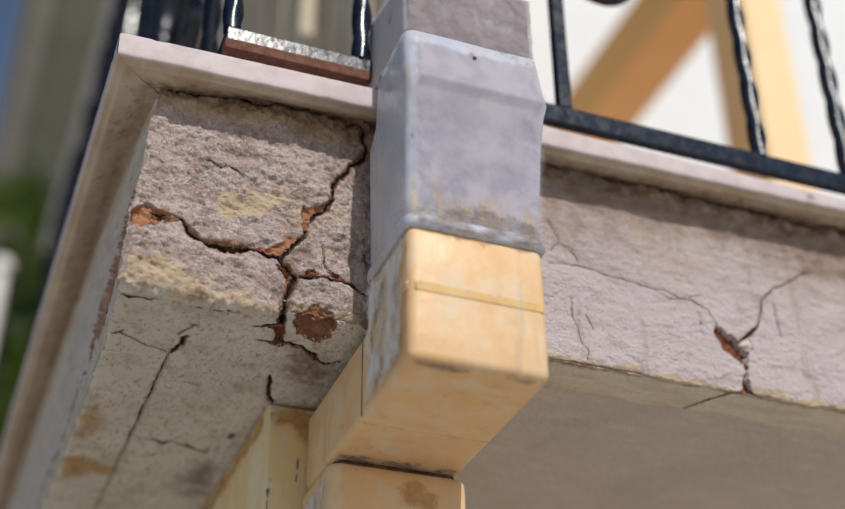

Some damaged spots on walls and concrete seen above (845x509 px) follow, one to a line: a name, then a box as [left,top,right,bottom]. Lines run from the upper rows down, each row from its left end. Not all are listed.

spalling [89,172,183,360]
crack [95,89,369,509]
spalling [292,303,338,343]
crack [551,300,639,374]
crack [548,220,716,323]
spalling [713,324,753,395]
crack [734,272,811,350]
crack [683,391,762,409]